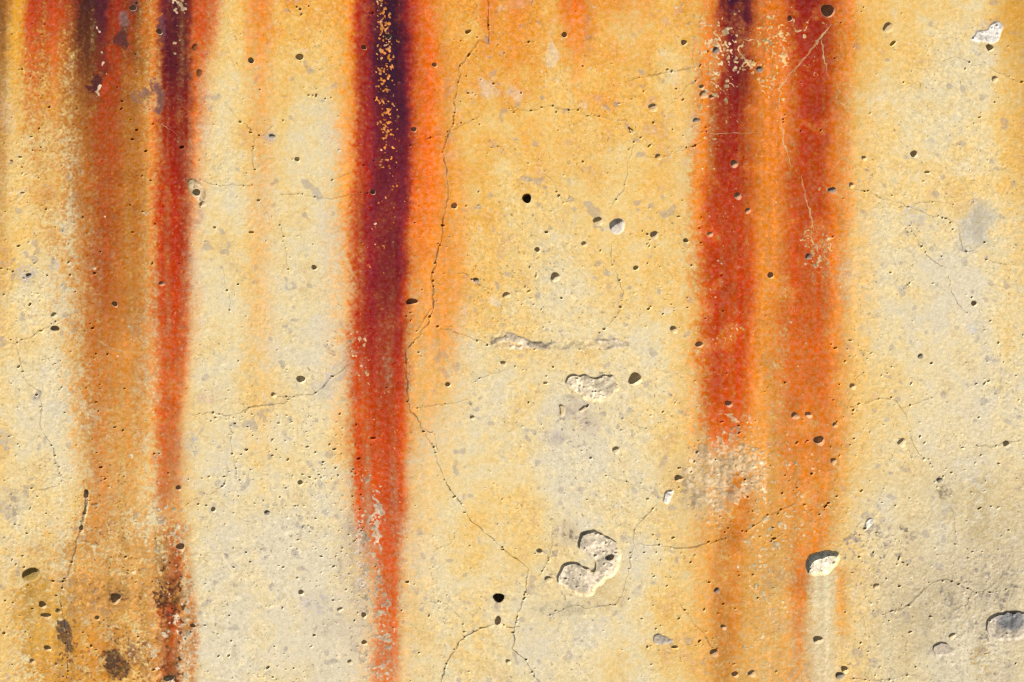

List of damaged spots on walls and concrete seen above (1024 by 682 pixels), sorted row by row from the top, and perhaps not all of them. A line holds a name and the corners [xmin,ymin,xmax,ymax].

spalling [971,20,1005,45]
rust [0,0,282,682]
rust [314,0,535,682]
crack [186,0,756,682]
spalling [536,525,622,611]
spalling [558,373,621,455]
rust [551,0,889,682]
peeling [662,404,927,681]
spalling [925,555,1024,682]